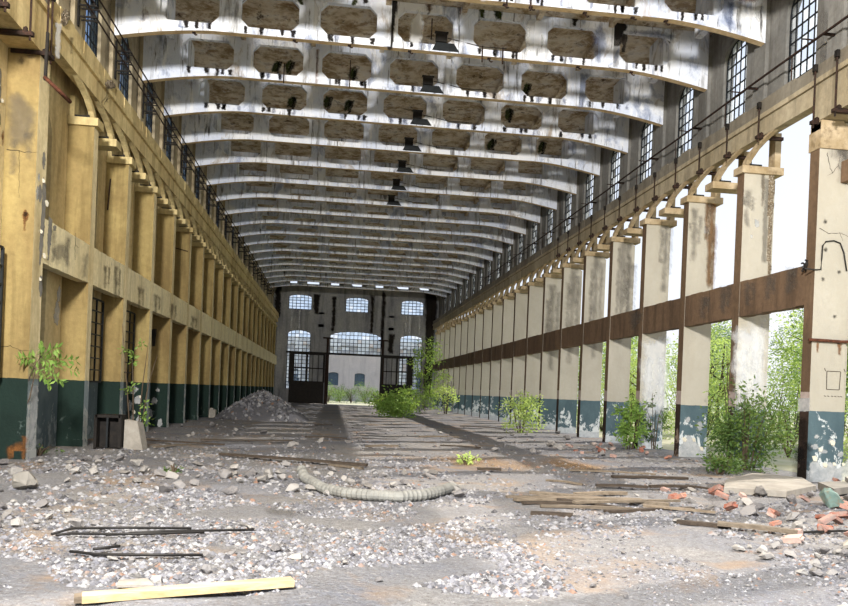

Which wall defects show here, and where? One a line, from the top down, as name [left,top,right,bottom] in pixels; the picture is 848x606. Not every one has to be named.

peeling [129,386,162,427]
peeling [798,398,810,412]
peeling [809,435,848,482]
spalling [814,500,848,537]